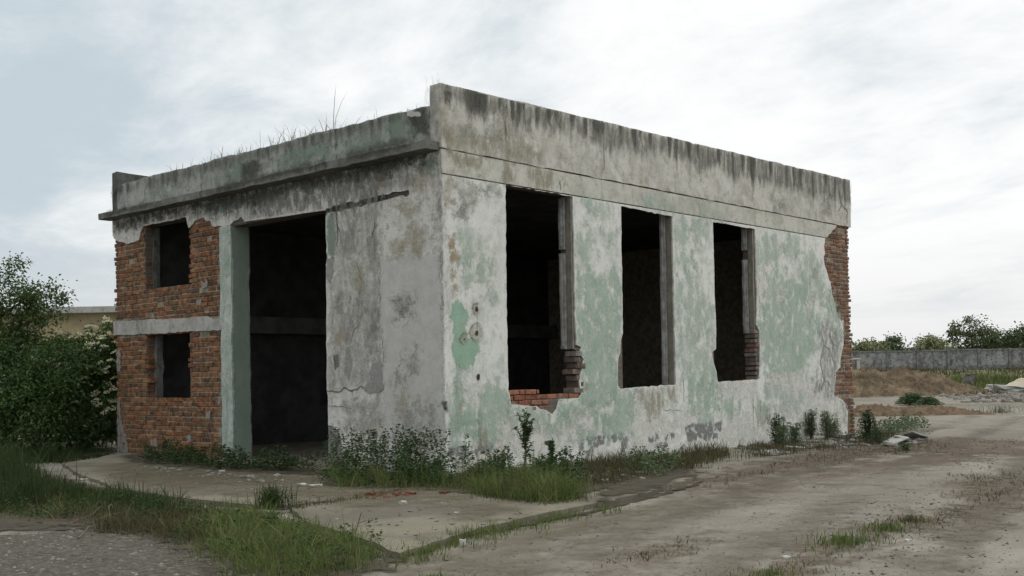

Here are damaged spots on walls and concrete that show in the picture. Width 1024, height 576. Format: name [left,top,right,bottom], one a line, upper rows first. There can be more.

leakage [107,109,437,229]
leakage [442,84,851,217]
crack [327,337,384,409]
crack [327,193,408,343]
peeling [441,229,637,470]
peeling [738,234,844,421]